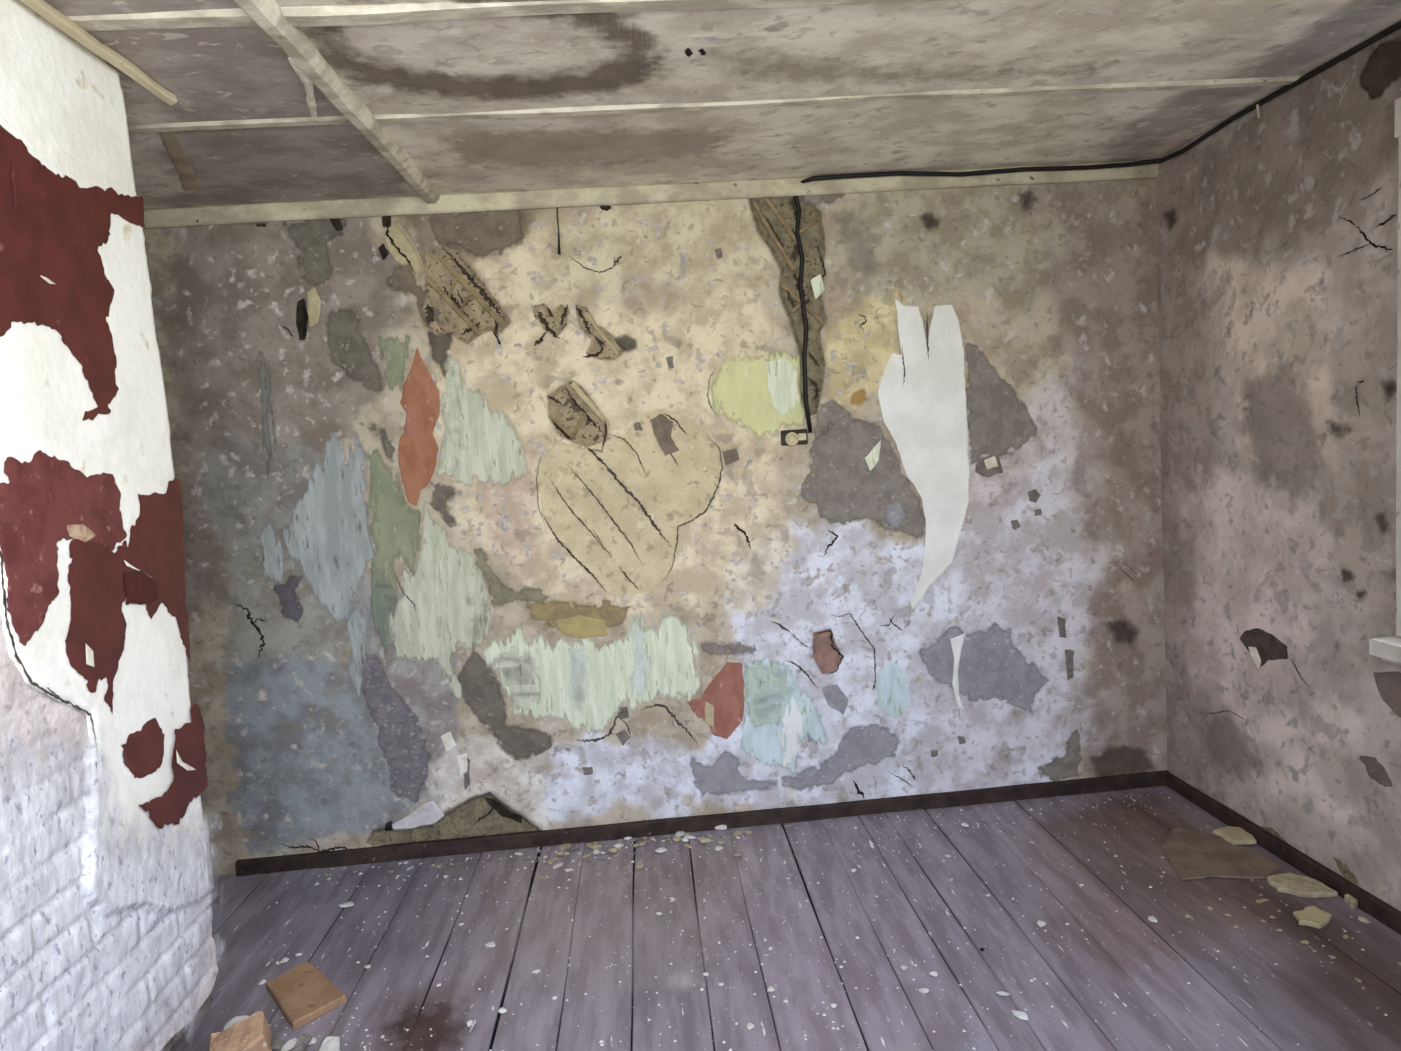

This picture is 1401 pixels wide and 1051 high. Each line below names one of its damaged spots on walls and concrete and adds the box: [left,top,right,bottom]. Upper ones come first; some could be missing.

water stain [311,0,653,100]
spalling [1360,39,1401,99]
crack [1338,186,1396,257]
peeling [0,125,145,421]
peeling [712,194,1037,609]
spalling [238,210,899,847]
peeling [0,450,191,714]
spalling [919,623,1049,711]
spalling [1240,628,1311,688]
spalling [1373,671,1401,717]
peeling [121,703,208,829]
spalling [1038,729,1081,782]